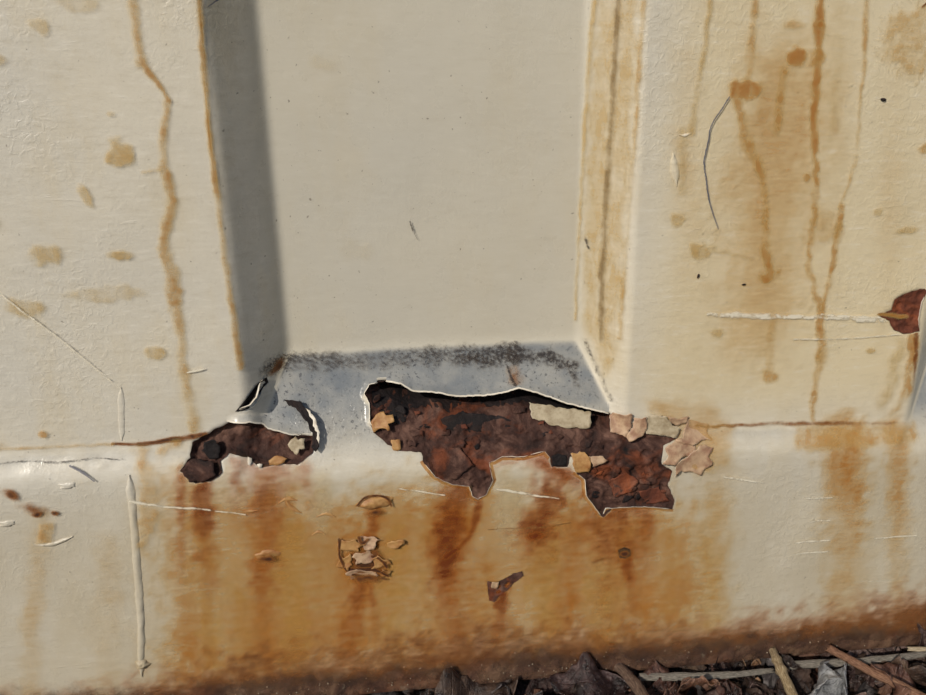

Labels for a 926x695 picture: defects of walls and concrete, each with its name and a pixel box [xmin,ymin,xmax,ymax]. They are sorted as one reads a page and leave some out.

corrosion [130,4,171,142]
corrosion [198,0,219,199]
corrosion [730,80,766,197]
corrosion [783,0,825,185]
corrosion [160,160,183,332]
peeling [878,289,926,334]
corrosion [26,505,58,518]
peeling [180,377,320,484]
peeling [487,571,524,602]
peeling [359,370,714,518]
corrosion [149,460,926,695]
corrosion [777,418,878,537]